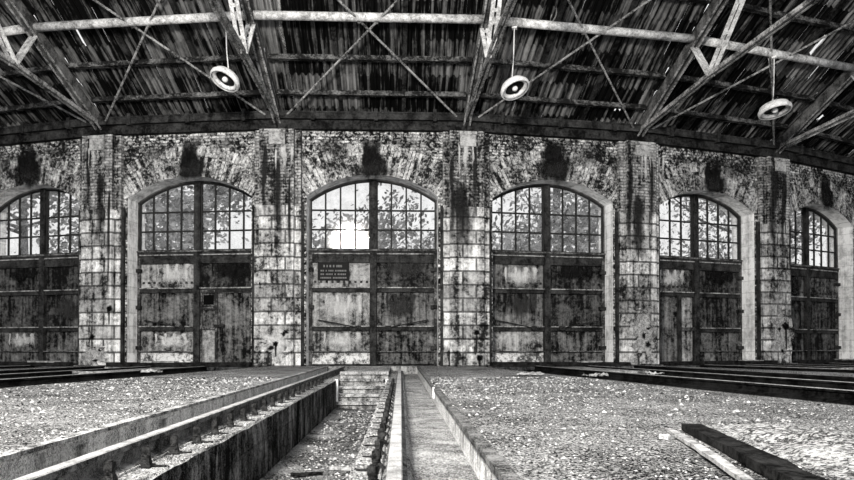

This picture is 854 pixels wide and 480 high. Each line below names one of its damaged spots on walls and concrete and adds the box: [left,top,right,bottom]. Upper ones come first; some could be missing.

leakage [18,144,38,182]
leakage [180,138,200,177]
leakage [362,138,381,175]
leakage [542,140,566,177]
leakage [704,157,740,192]